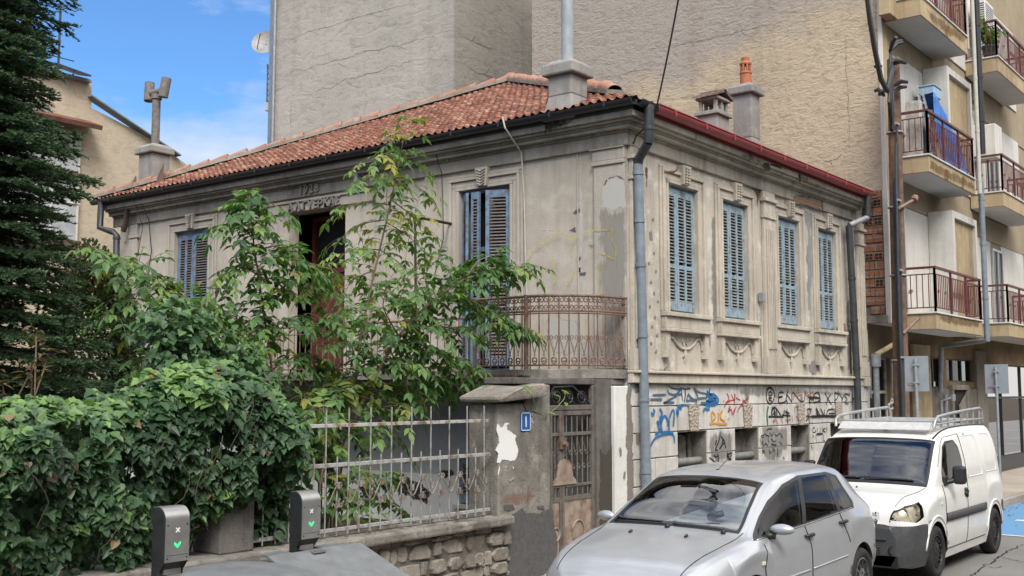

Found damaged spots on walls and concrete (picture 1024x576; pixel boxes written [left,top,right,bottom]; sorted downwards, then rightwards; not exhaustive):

crack [290,31,496,133]
peeling [600,176,628,370]
peeling [495,423,518,482]